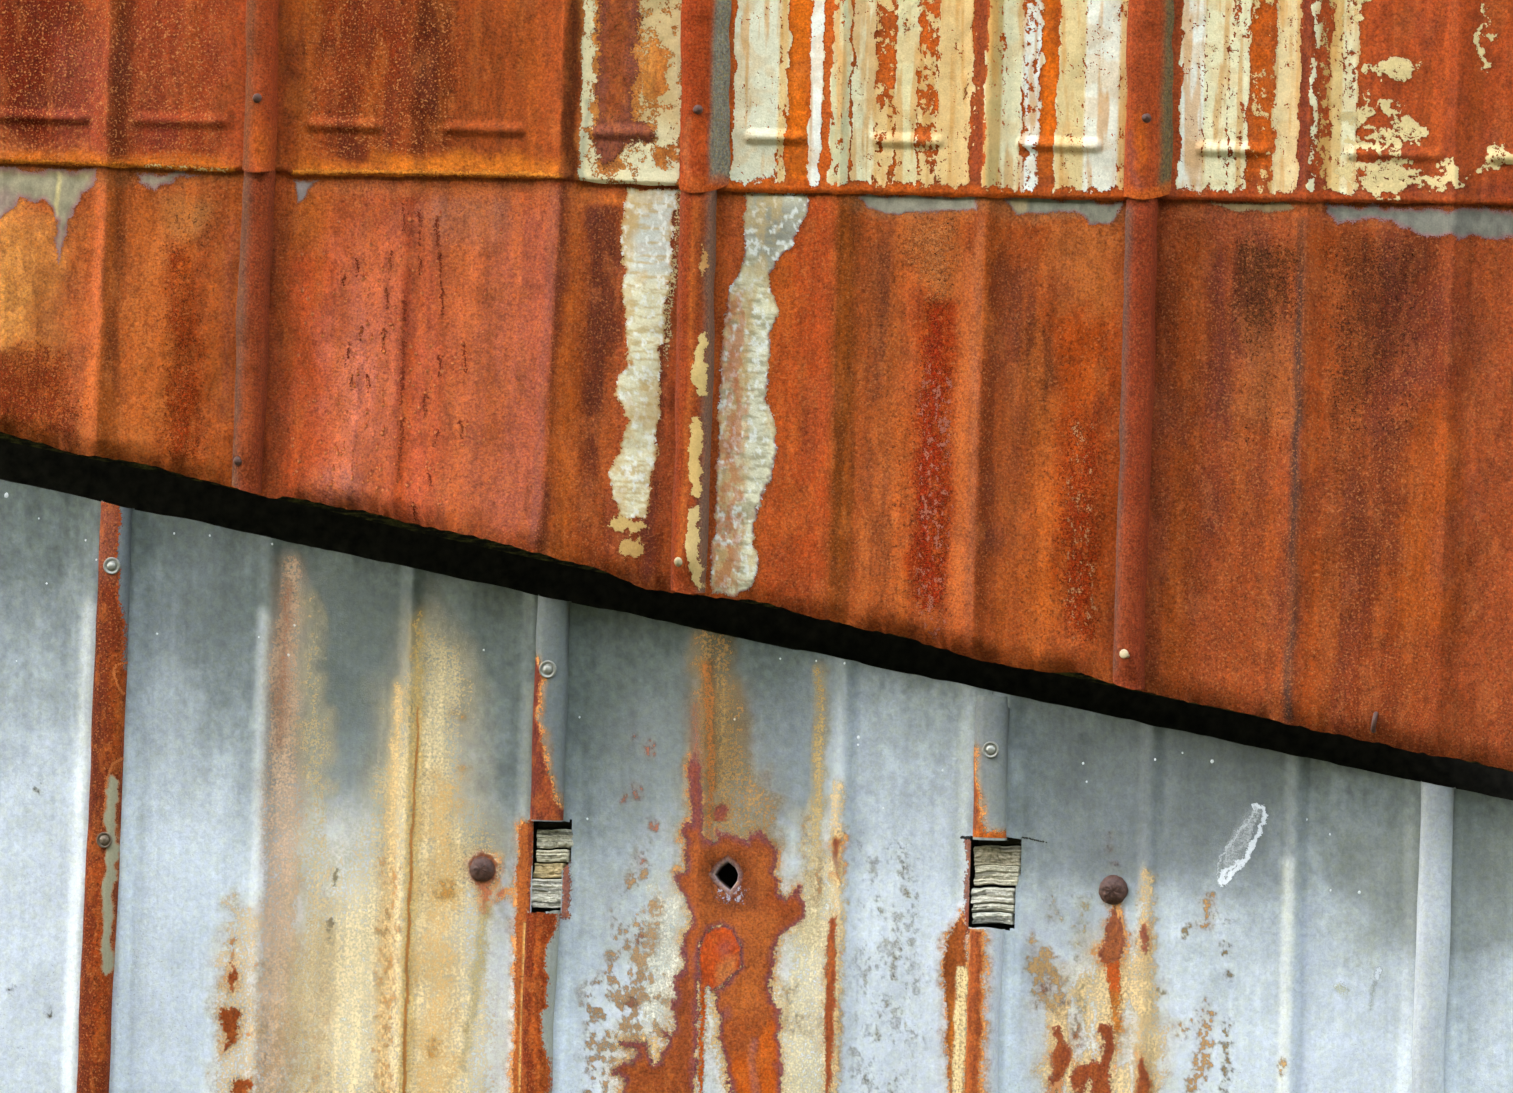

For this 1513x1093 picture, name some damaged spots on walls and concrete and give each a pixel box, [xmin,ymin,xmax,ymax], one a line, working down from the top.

peeling [0,166,97,265]
peeling [137,170,202,191]
corrosion [292,166,562,179]
peeling [577,0,682,558]
peeling [683,0,1129,597]
peeling [1175,0,1513,241]
peeling [915,360,954,641]
corrosion [76,501,129,1093]
corrosion [214,556,572,1093]
corrosion [610,630,849,1093]
corrosion [939,747,1007,1093]
corrosion [1034,869,1169,1093]